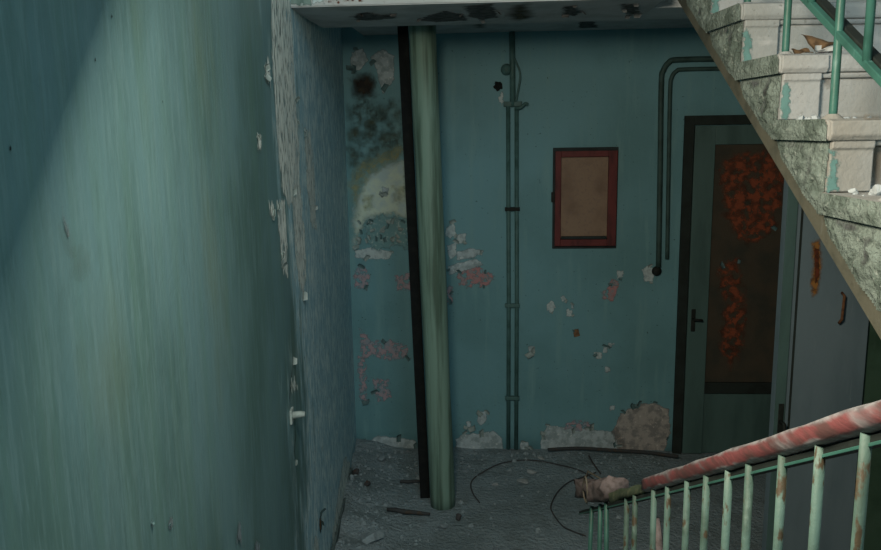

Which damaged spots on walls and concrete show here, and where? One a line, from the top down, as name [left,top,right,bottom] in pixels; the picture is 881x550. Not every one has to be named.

water stain [353,75,374,96]
peeling [264,0,318,301]
spalling [686,0,881,312]
peeling [352,160,410,290]
peeling [445,219,493,305]
peeling [357,334,410,405]
peeling [455,410,503,449]